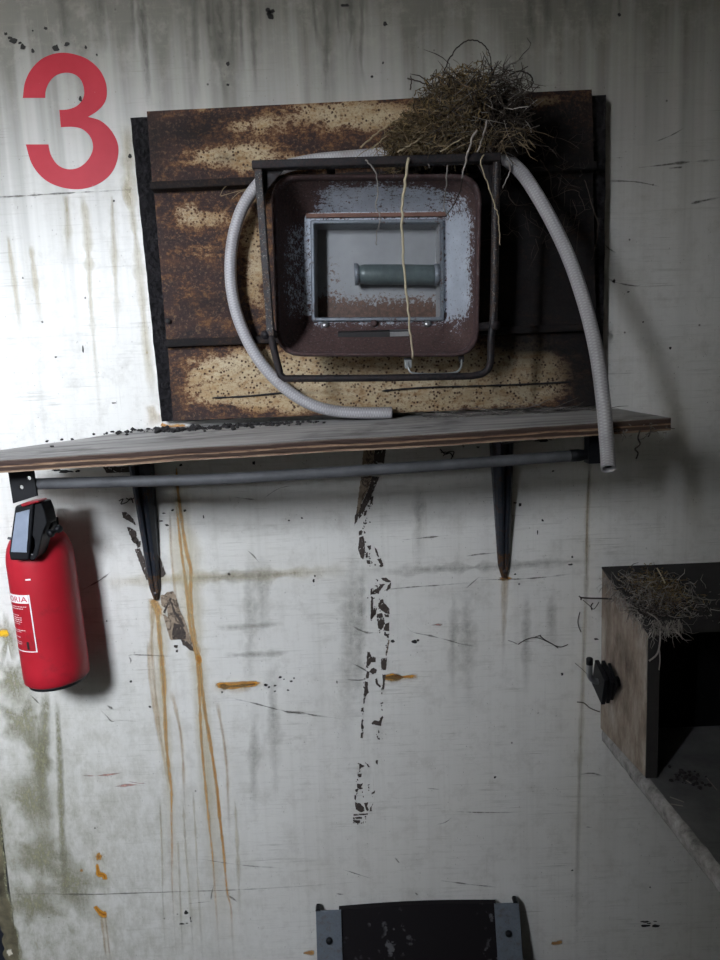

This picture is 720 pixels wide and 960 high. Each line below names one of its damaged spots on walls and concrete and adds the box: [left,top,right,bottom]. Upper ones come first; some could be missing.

peeling [362,449,386,465]
peeling [160,591,194,652]
peeling [354,476,395,740]
damp [4,669,24,697]
corrosion [151,599,172,831]
corrosion [170,469,228,894]
corrosion [217,681,259,689]
corrosion [385,673,415,681]
damp [6,702,87,899]
peeling [353,760,378,823]